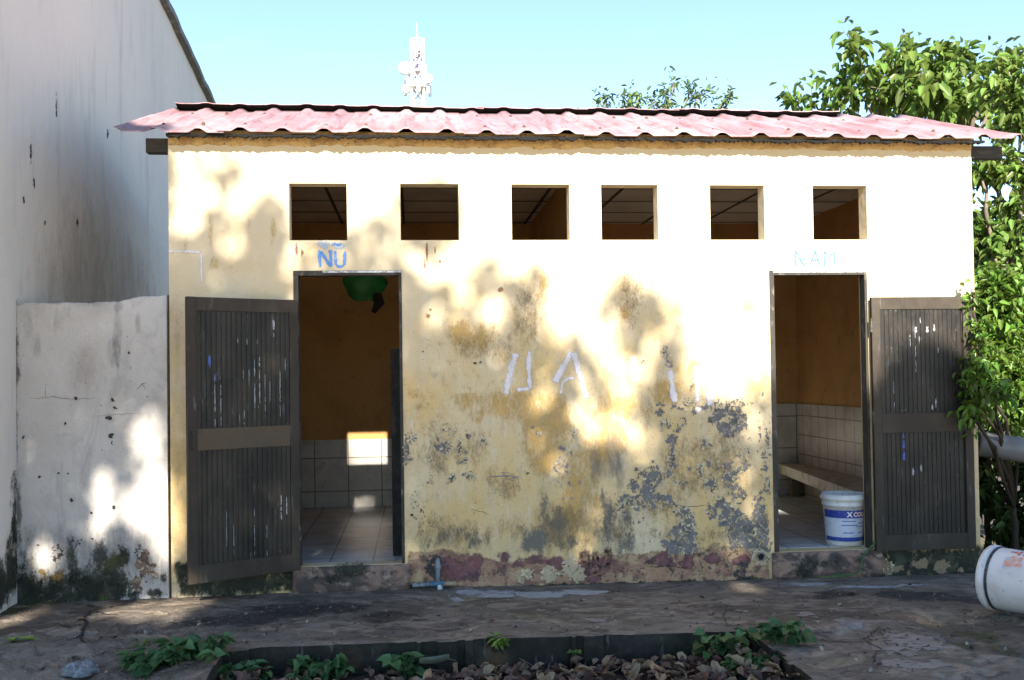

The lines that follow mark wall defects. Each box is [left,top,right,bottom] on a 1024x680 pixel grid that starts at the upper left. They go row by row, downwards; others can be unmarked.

peeling [660,346,675,368]
peeling [402,430,418,466]
peeling [410,422,489,533]
peeling [424,377,774,584]
leakage [0,473,415,628]
leakage [783,545,982,605]